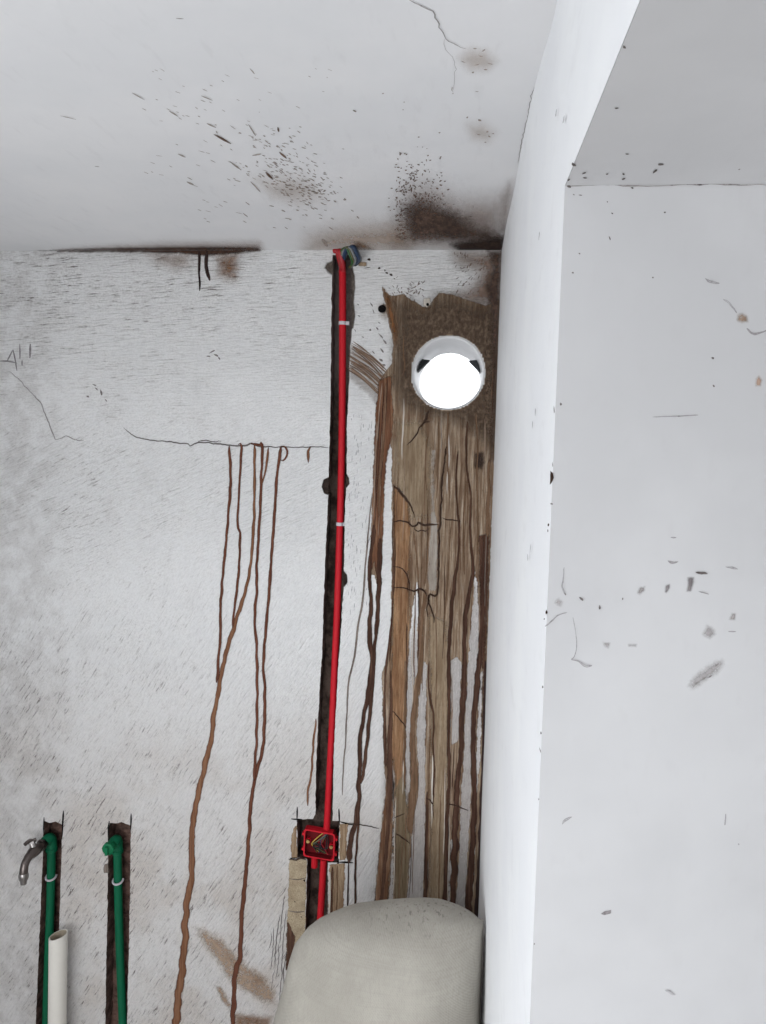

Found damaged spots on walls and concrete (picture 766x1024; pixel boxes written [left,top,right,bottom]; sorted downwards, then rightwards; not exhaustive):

crack [410,0,465,91]
water stain [57,247,259,291]
crack [12,373,83,441]
crack [124,428,328,448]
crack [407,411,430,445]
water stain [168,75,503,917]
crack [392,446,458,621]
rust [172,442,288,1024]